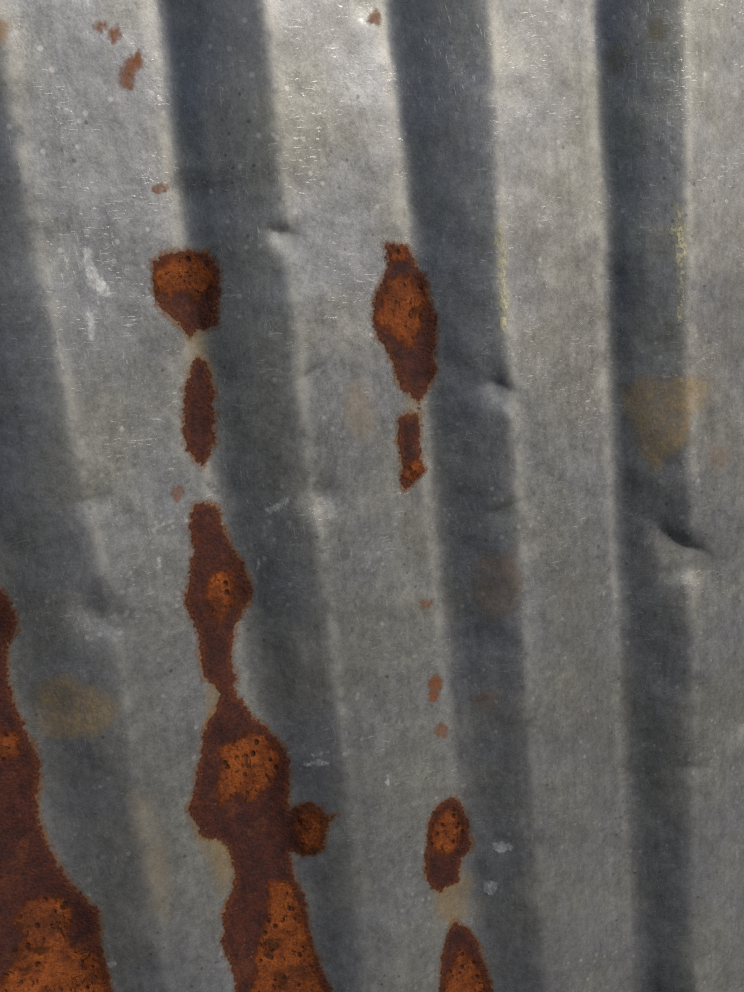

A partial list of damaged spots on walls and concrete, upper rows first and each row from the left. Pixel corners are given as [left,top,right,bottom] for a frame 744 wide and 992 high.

corrosion [149,248,223,340]
corrosion [179,355,219,466]
corrosion [371,241,440,492]
corrosion [0,586,113,992]
corrosion [184,501,340,992]
corrosion [423,797,476,894]
corrosion [439,918,494,992]